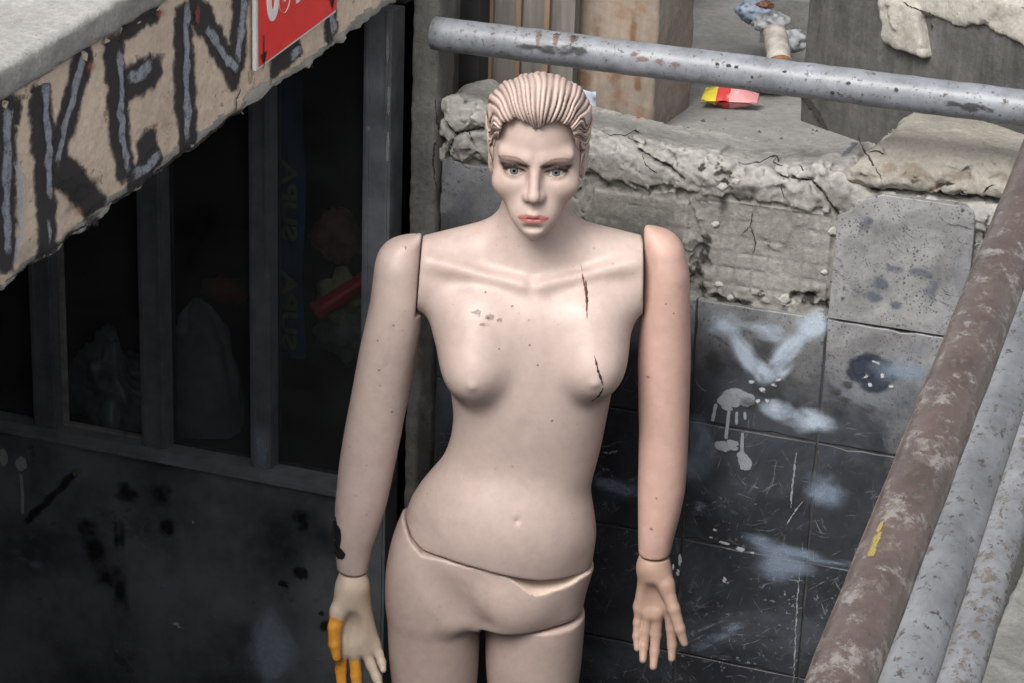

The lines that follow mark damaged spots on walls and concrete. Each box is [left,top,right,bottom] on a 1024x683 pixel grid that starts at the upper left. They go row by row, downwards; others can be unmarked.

spalling [698,163,740,191]
crack [858,137,886,179]
spalling [688,221,765,305]
spalling [778,290,829,315]